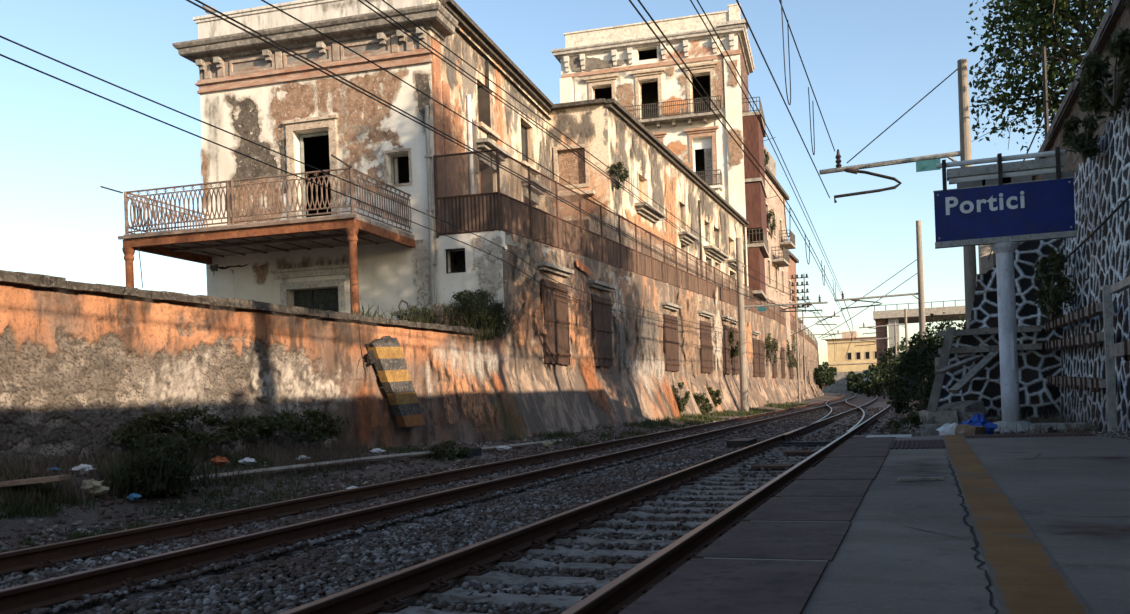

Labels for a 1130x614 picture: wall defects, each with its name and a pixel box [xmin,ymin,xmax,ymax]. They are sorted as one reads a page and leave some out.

flaking render [224,25,744,270]
spalling [147,353,214,433]
spalling [246,356,350,428]
rust [490,371,525,426]
rust [582,360,616,420]